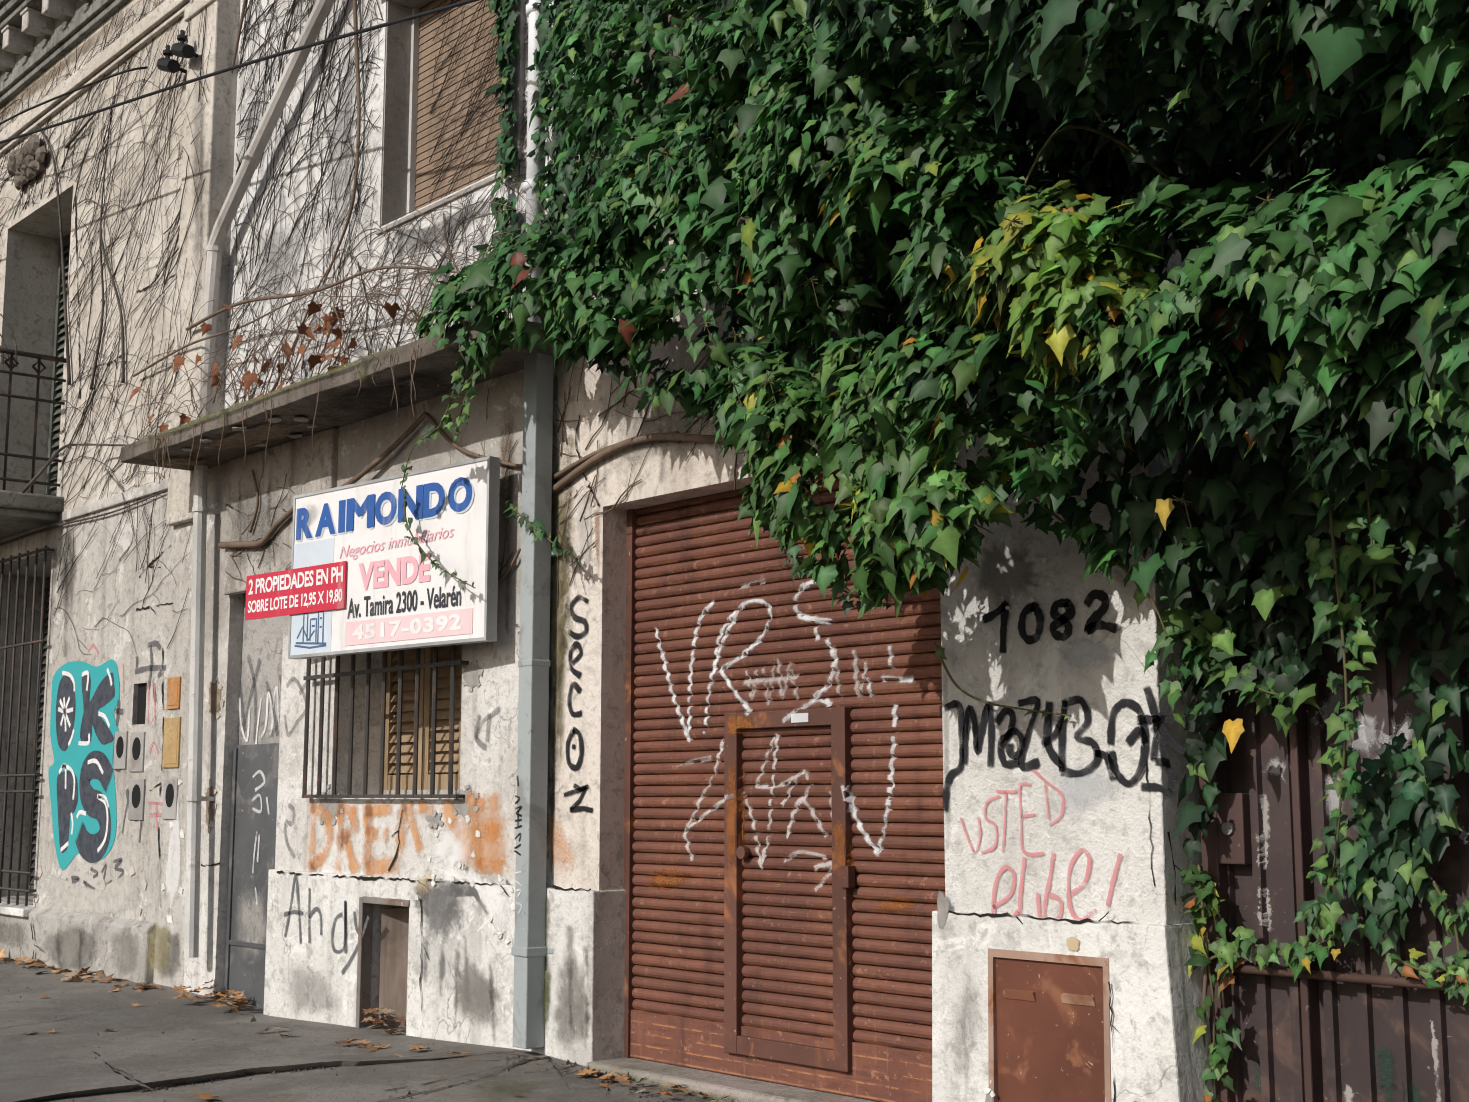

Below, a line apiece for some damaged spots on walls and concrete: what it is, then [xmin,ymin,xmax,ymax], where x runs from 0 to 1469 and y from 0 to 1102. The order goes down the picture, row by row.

corrosion [727,775,747,858]
corrosion [835,824,855,873]
crack [1139,762,1182,905]
corrosion [653,870,684,888]
corrosion [879,897,914,911]
crack [948,910,1133,924]
water stain [416,887,496,1019]
spalling [979,1087,996,1102]